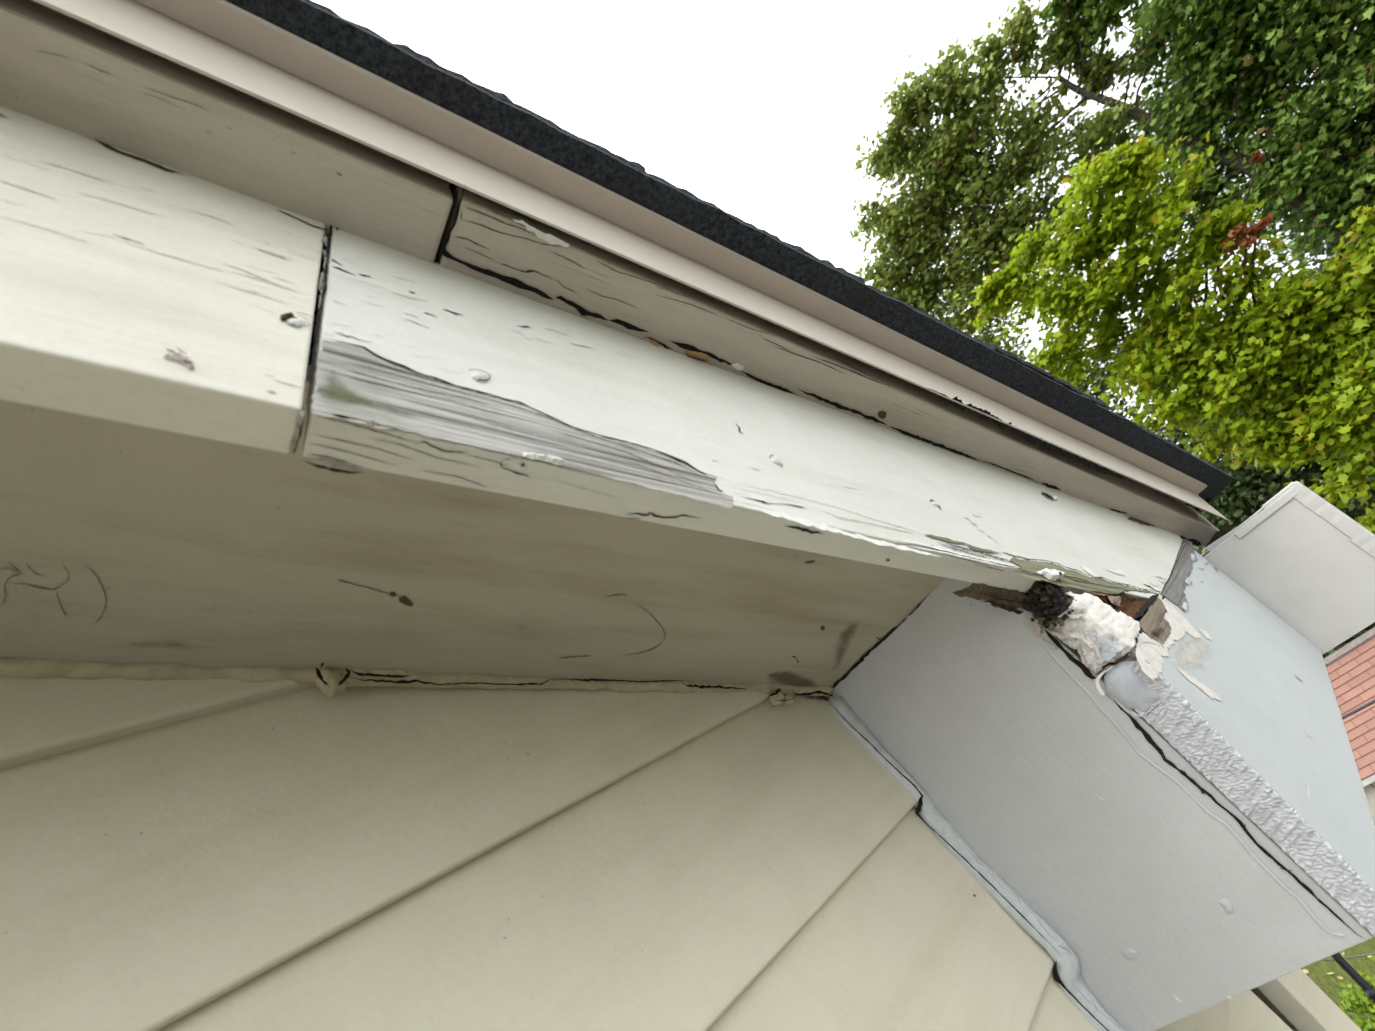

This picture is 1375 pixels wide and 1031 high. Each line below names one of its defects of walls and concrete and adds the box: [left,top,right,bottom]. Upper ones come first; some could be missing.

crack [34,50,233,133]
crack [0,139,507,488]
crack [458,200,898,389]
peeling [302,334,734,509]
peeling [1009,523,1233,650]